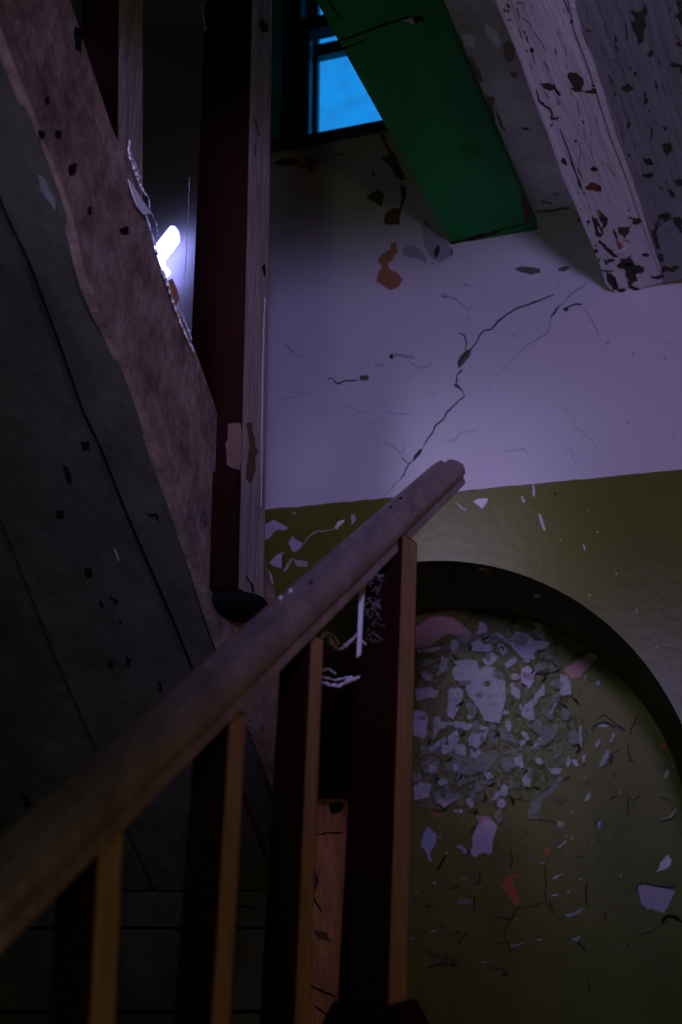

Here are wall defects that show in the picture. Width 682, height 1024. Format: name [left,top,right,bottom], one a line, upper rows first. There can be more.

spalling [630,5,654,57]
spalling [568,72,597,94]
peeling [576,166,602,195]
spalling [515,266,541,275]
spalling [577,209,682,292]
peeling [225,298,266,506]
crack [383,270,613,496]
peeling [265,514,356,584]
peeling [413,616,615,865]
peeling [656,855,672,873]
peeling [638,884,675,913]